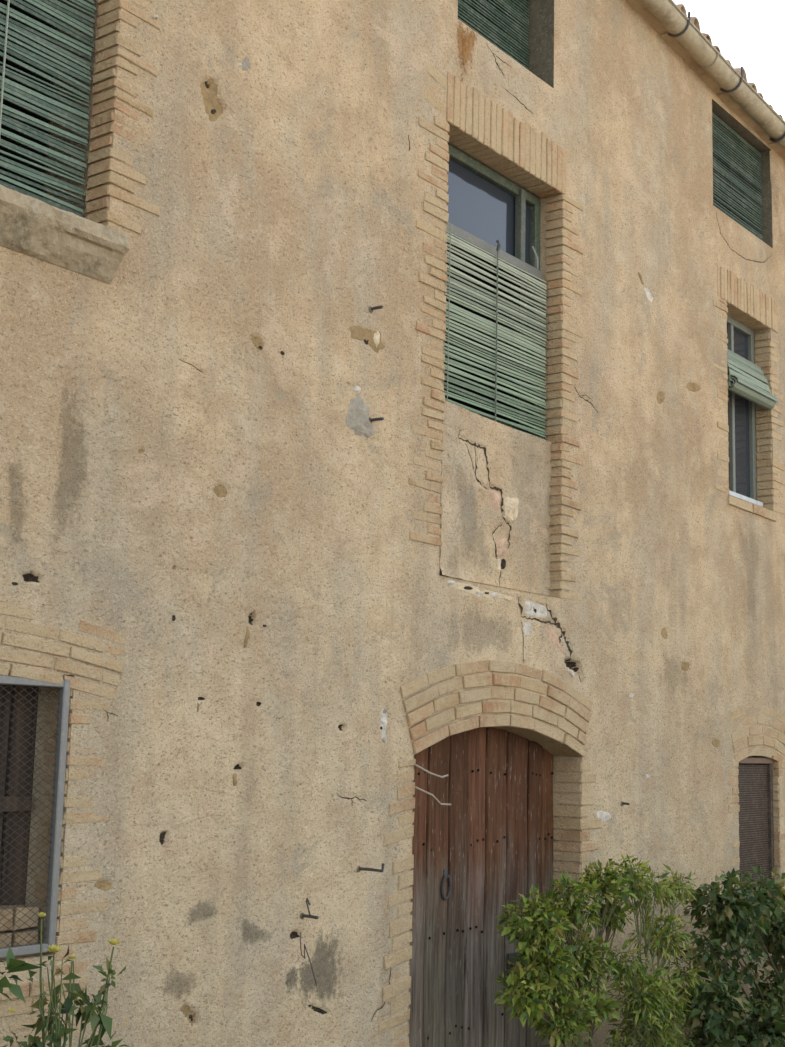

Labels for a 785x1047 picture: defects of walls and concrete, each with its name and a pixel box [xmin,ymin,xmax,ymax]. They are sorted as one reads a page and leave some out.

rust [458,25,477,71]
flaking render [200,77,224,122]
crack [458,430,581,681]
spalling [12,573,39,585]
leakage [287,938,337,998]
flaking render [180,1006,196,1026]